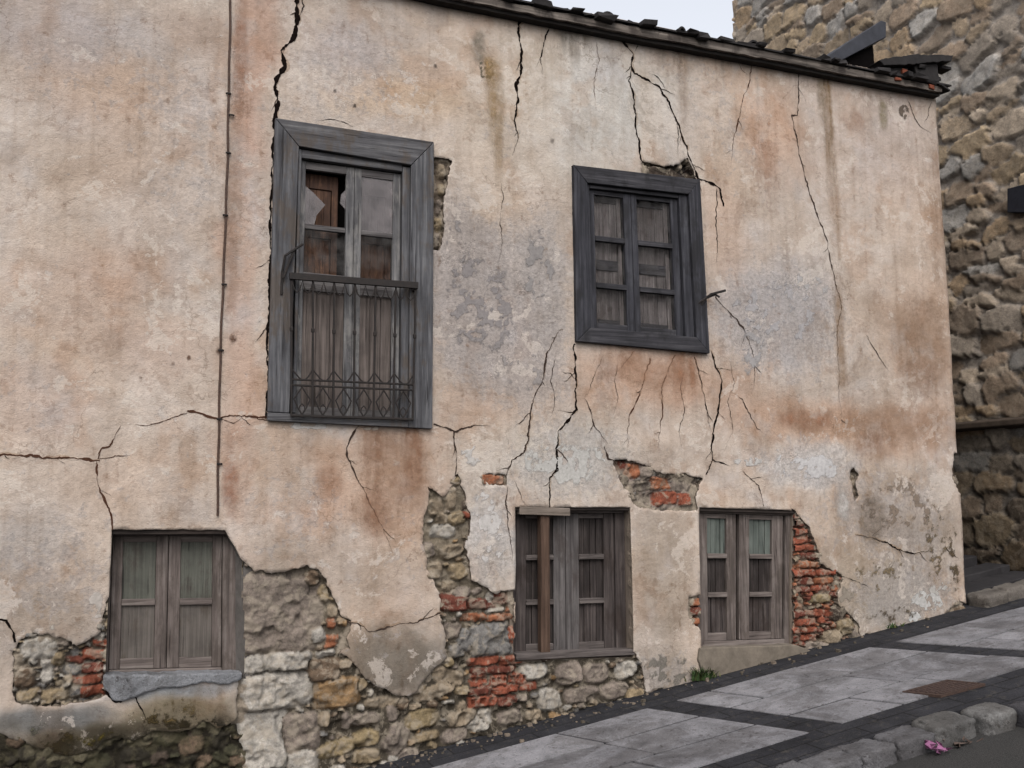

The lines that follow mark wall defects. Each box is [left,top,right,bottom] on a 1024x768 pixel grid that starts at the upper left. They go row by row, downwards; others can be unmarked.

crack [512,22,549,155]
crack [622,42,724,253]
crack [0,0,305,530]
crack [791,74,846,424]
crack [346,427,395,553]
flaking render [457,505,470,523]
flaking render [480,474,506,485]
crack [498,296,764,558]
flaking render [613,460,701,511]
flaking render [791,513,840,646]
flaking render [59,631,107,702]
flaking render [438,586,542,714]